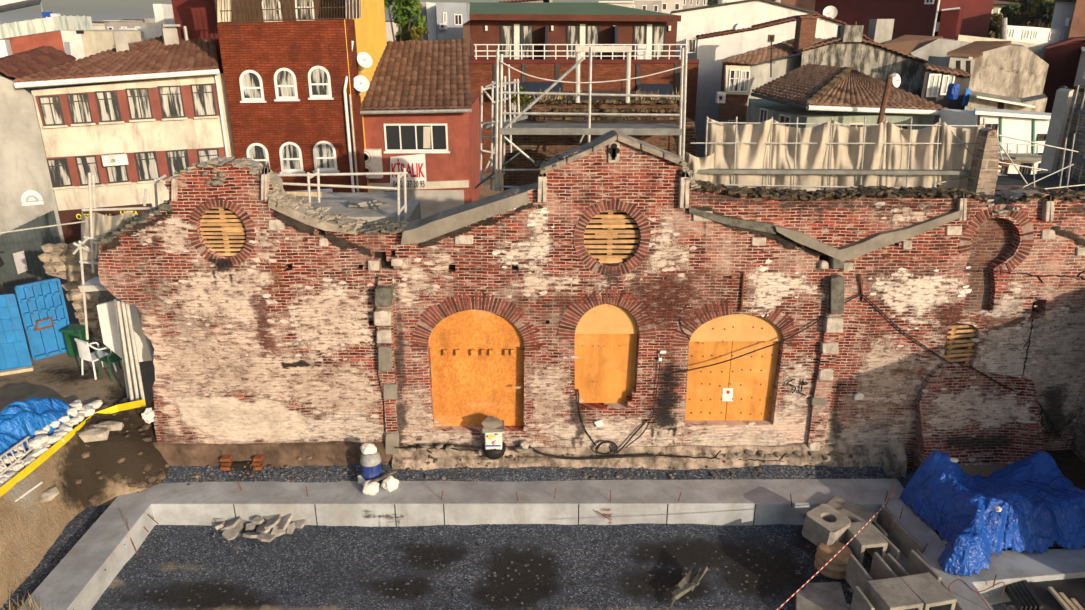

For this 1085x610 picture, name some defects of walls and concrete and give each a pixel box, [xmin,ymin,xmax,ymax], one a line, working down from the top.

peeling [99,210,441,443]
peeling [392,197,702,333]
peeling [743,259,827,317]
peeling [838,266,1085,450]